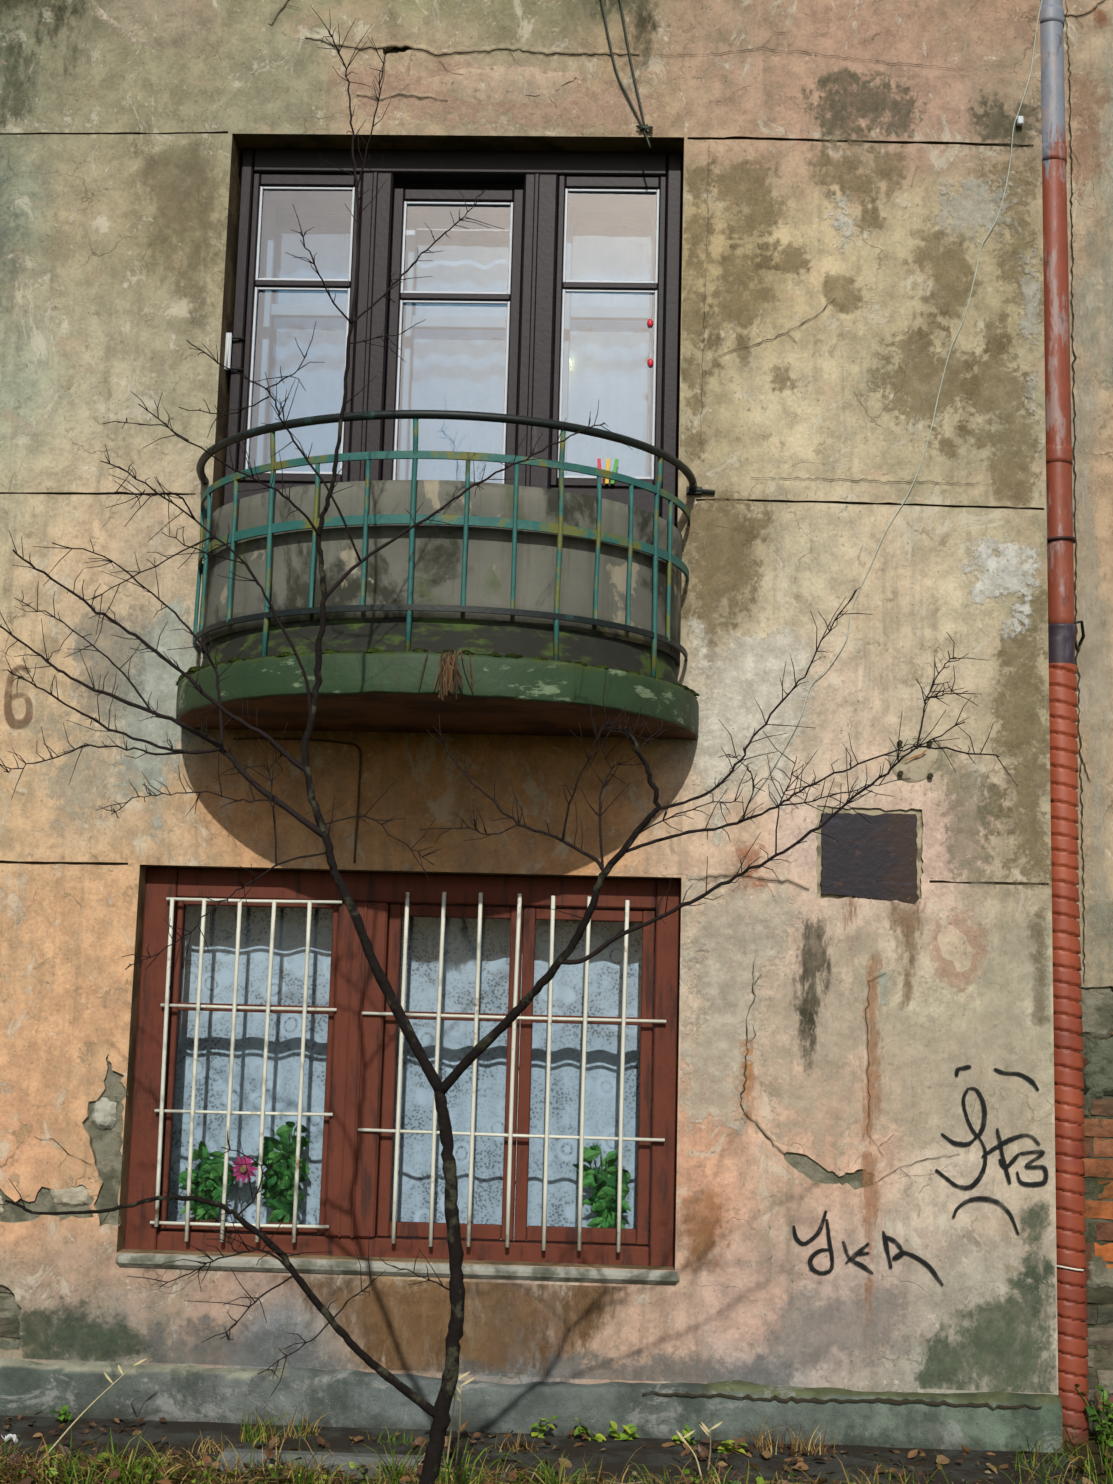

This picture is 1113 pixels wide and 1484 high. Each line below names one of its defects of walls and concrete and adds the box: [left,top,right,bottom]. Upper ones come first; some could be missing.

water stain [92,2,153,45]
crack [267,0,965,104]
crack [1064,0,1104,982]
peeling [933,539,1052,884]
crack [740,956,788,1155]
water stain [794,919,831,1067]
flaking render [0,1285,22,1351]
flaking render [0,1053,128,1226]
water stain [306,1280,788,1385]
water stain [1021,1203,1052,1289]
flaking render [1078,986,1113,1434]